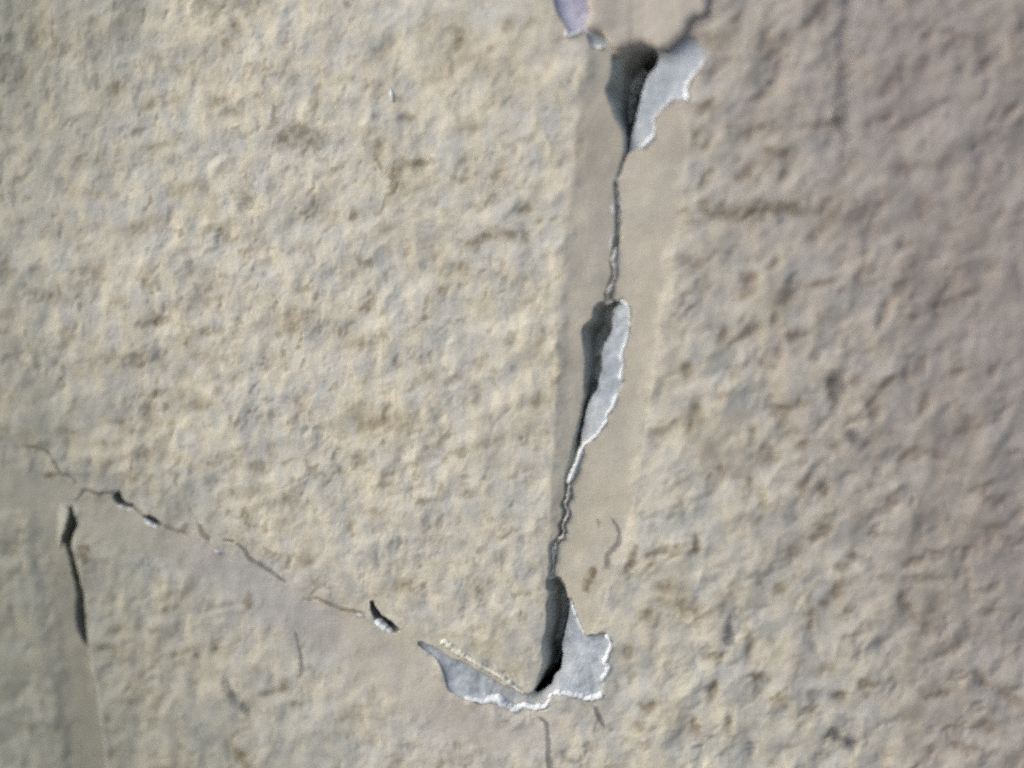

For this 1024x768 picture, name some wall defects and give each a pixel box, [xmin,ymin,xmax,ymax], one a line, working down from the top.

spalling [554,0,708,181]
crack [604,180,622,304]
spalling [564,297,632,484]
crack [25,446,144,644]
crack [224,540,282,580]
crack [548,480,572,579]
crack [605,520,620,565]
crack [294,631,302,675]
spalling [357,600,400,633]
spalling [418,572,613,713]
crack [541,718,551,768]